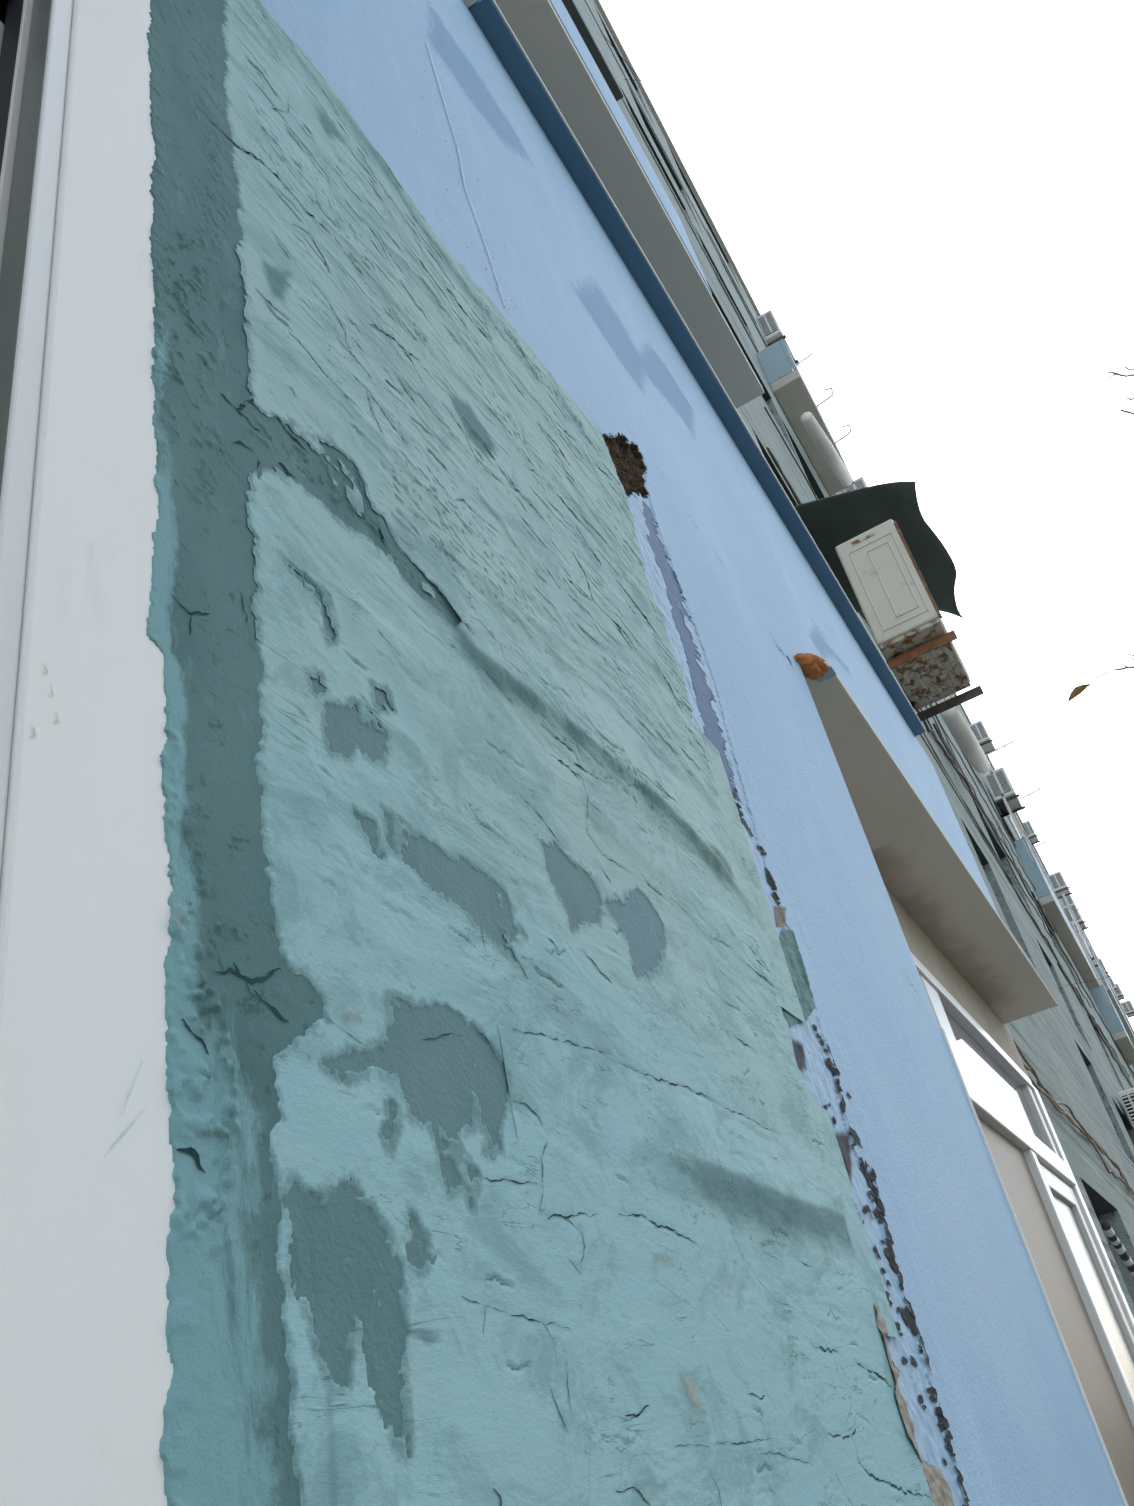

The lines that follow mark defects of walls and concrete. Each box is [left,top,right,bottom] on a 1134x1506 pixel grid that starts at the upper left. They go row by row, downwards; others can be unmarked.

crack [221,393,309,480]
crack [510,424,681,709]
spalling [602,432,650,499]
peeling [146,0,459,1506]
peeling [731,788,781,904]
crack [177,1147,206,1173]
crack [212,962,361,1043]
peeling [322,1001,508,1209]
crack [423,1029,773,1274]
flaking render [779,928,840,1076]
crack [669,1034,970,1506]
spalling [823,1102,956,1506]